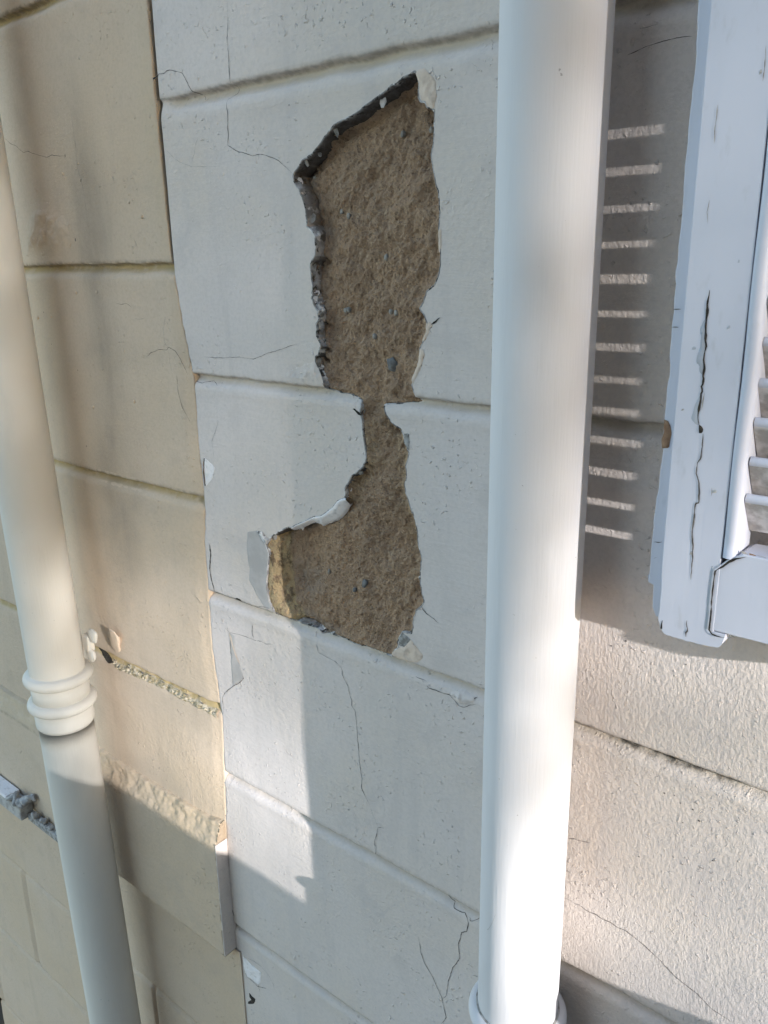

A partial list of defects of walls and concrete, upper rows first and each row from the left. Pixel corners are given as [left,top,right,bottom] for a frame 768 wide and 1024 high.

crack [153,10,290,171]
flaking render [247,68,441,663]
crack [419,896,479,1023]